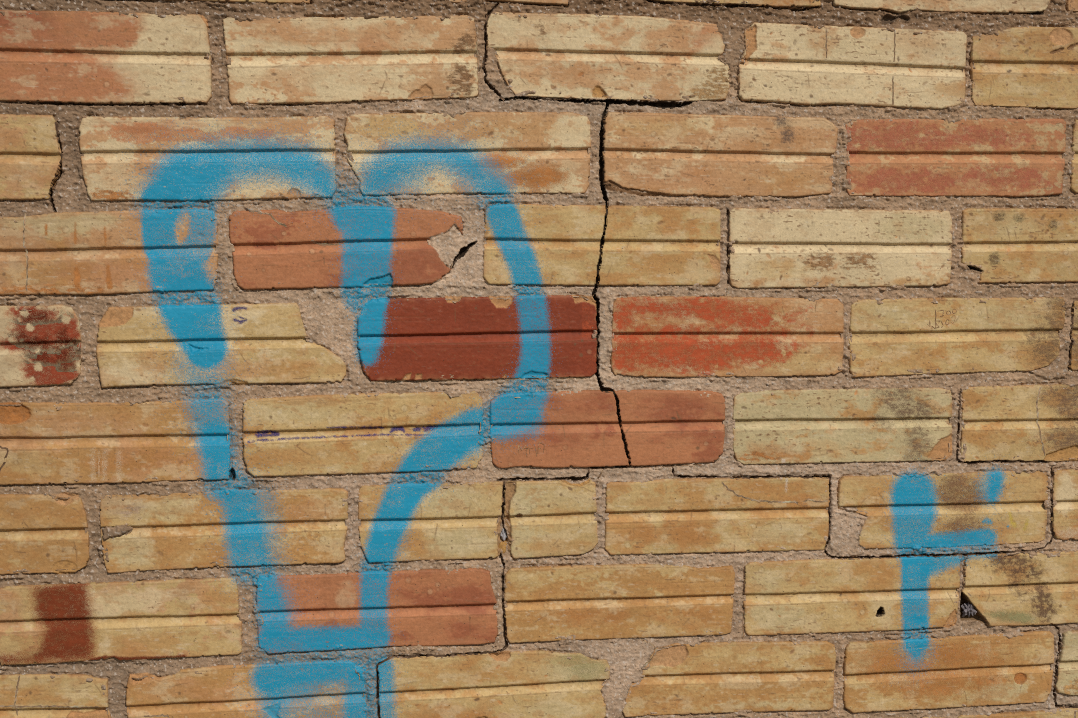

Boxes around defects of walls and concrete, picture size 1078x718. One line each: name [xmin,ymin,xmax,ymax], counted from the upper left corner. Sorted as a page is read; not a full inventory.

crack [25,0,1072,589]
crack [1067,297,1078,372]
crack [740,566,748,639]
spalling [943,590,990,628]